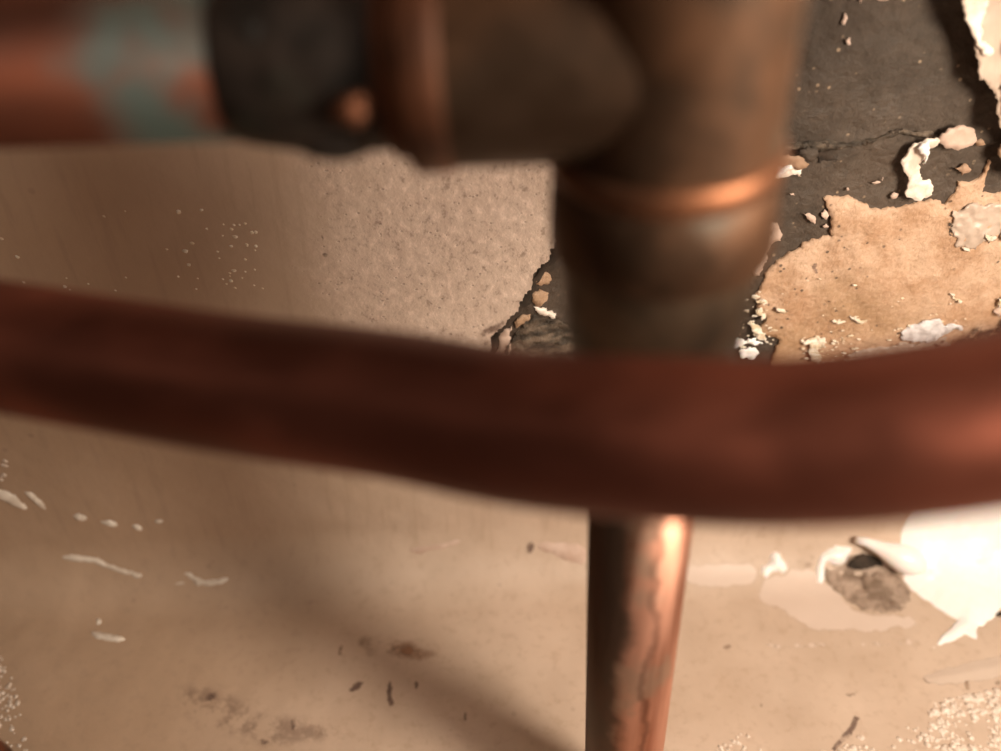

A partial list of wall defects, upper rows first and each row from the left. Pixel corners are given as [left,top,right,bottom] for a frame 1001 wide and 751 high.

flaking render [737,0,1001,357]
flaking render [483,242,572,353]
flaking render [825,553,911,613]